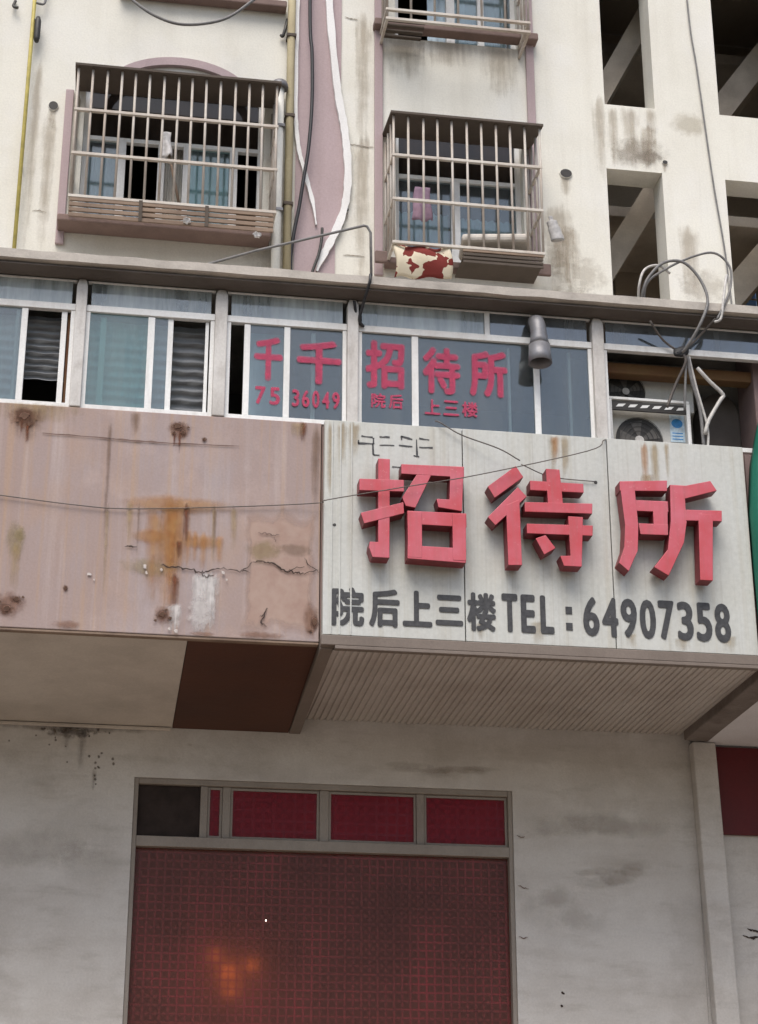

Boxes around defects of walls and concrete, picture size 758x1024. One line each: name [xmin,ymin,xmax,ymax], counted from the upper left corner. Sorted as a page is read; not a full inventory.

crack [162,532,319,578]
damp [35,727,110,747]